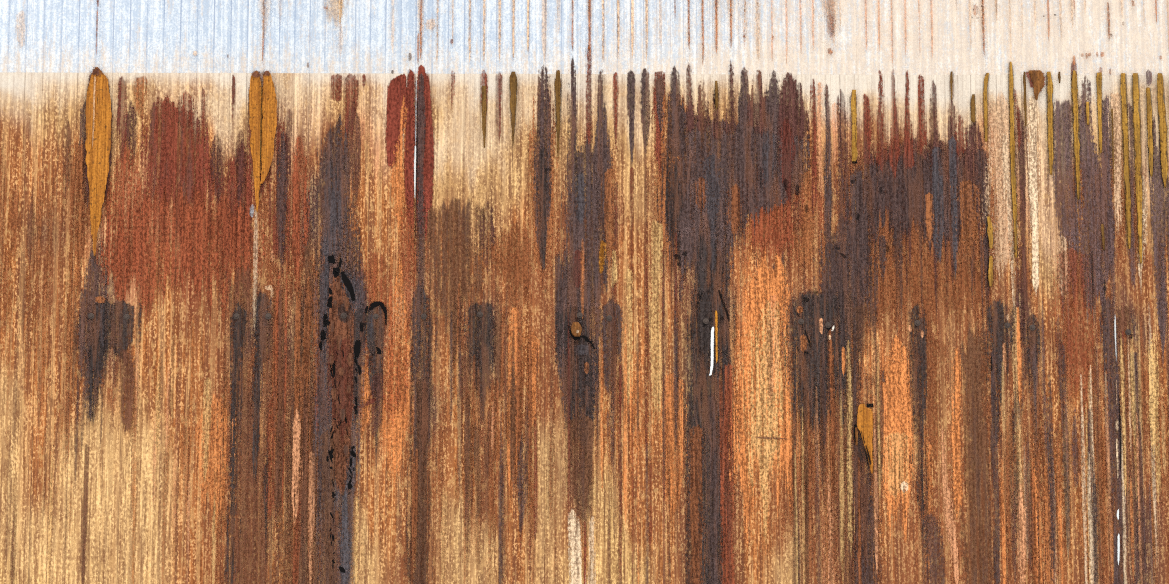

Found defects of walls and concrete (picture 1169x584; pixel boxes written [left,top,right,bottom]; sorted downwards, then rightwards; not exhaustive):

corrosion [0,164,42,288]
corrosion [65,0,369,584]
corrosion [360,0,1169,584]